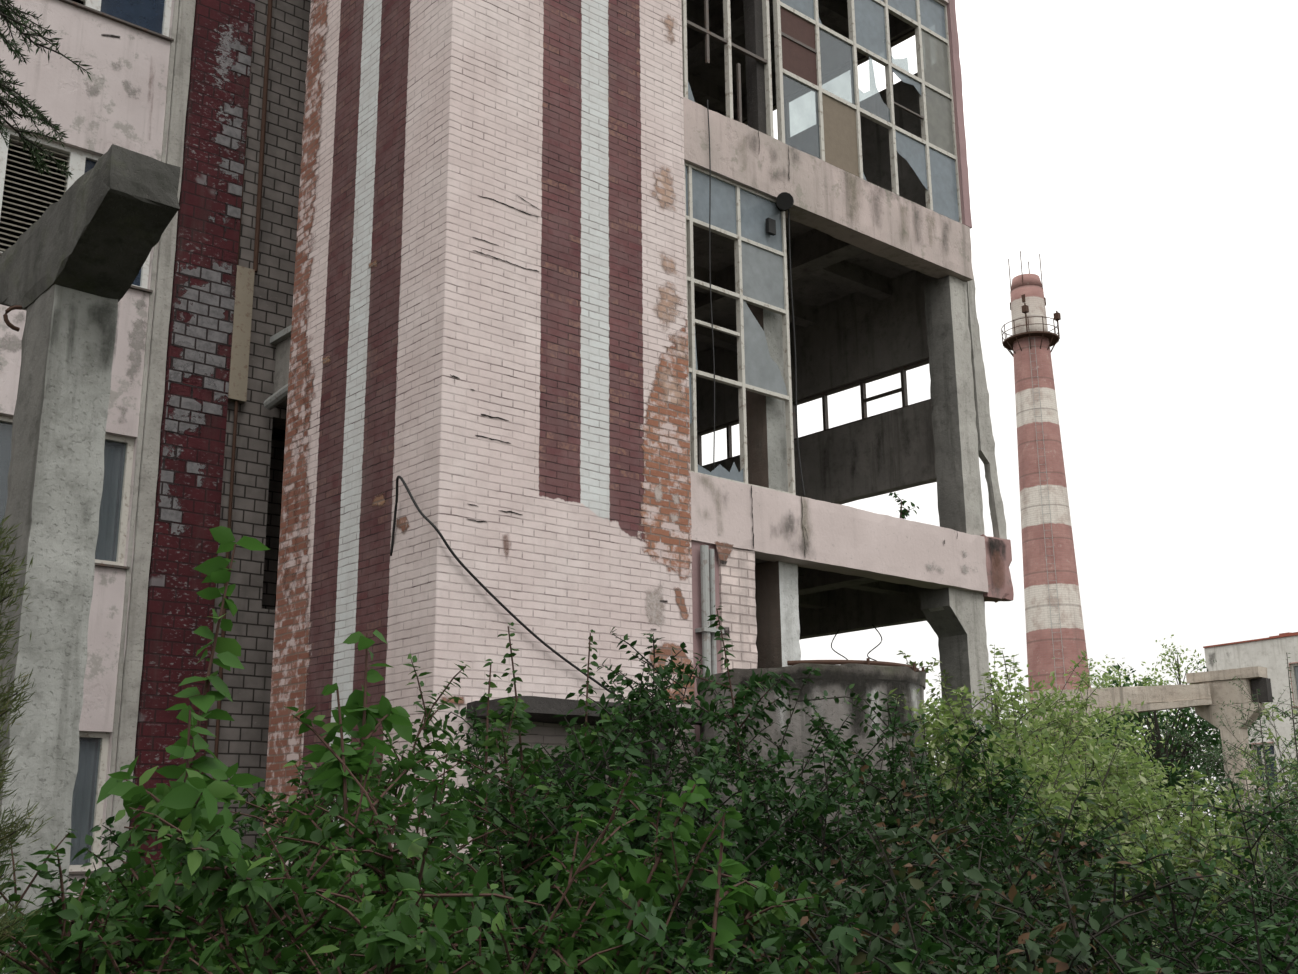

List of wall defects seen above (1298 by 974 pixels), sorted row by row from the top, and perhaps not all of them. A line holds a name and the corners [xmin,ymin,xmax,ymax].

peeling [205,19,251,241]
crack [480,195,538,217]
peeling [652,167,675,208]
crack [473,237,539,272]
peeling [128,298,146,379]
peeling [156,262,235,537]
peeling [263,0,330,843]
crack [450,374,511,444]
peeling [637,255,692,630]
crack [468,504,522,522]
water stain [988,537,1006,561]
peeling [650,643,695,704]